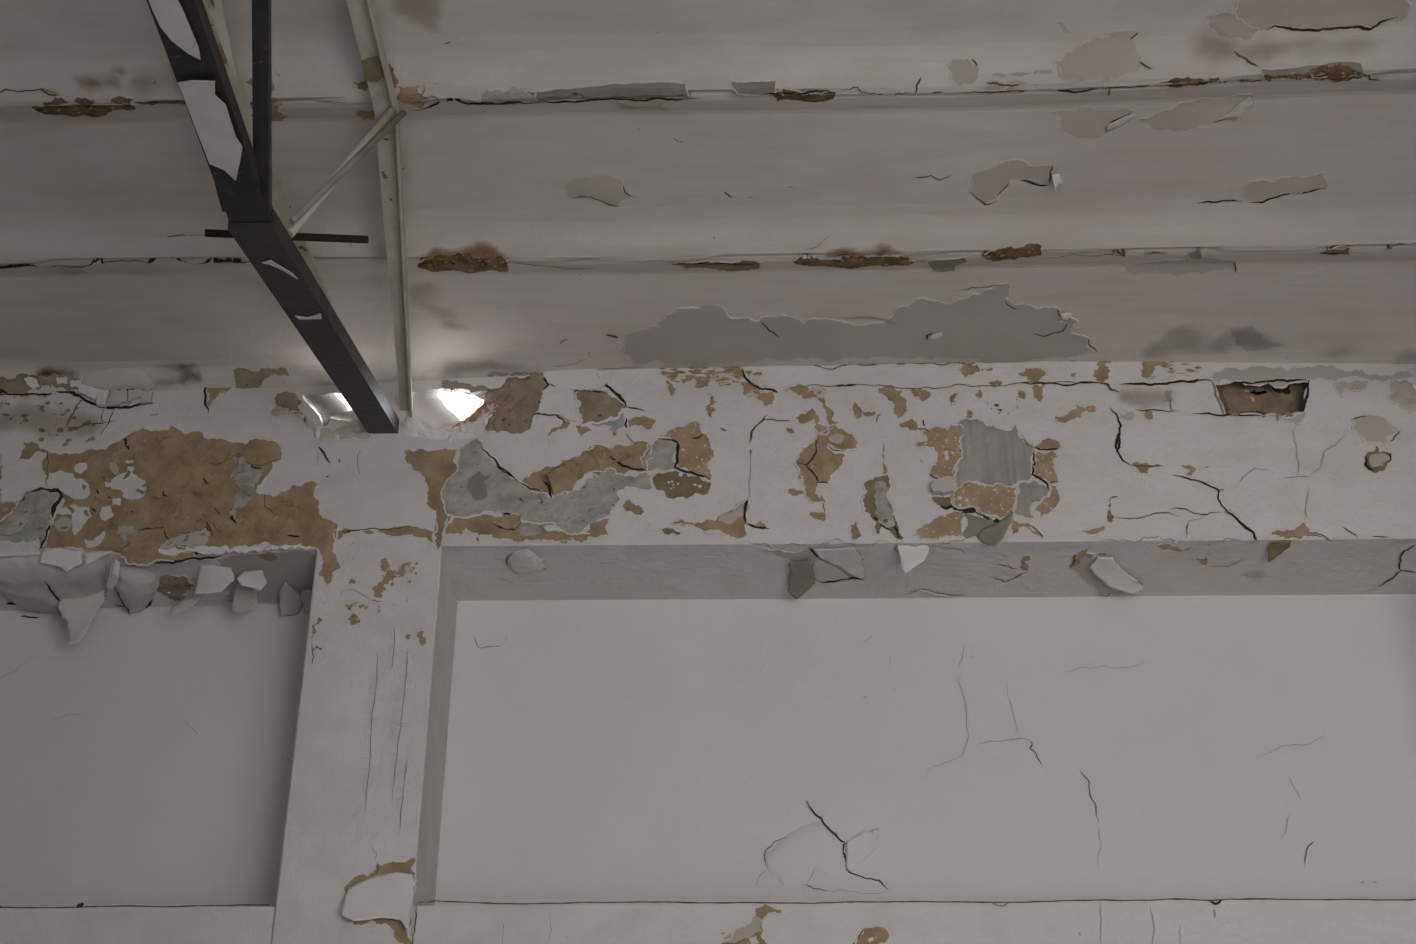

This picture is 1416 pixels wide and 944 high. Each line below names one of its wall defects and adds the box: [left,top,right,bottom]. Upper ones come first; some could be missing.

spalling [729,78,941,103]
peeling [1051,0,1412,140]
crack [0,234,250,275]
peeling [791,235,1238,277]
peeling [1141,362,1416,447]
peeling [0,282,1111,663]
crack [721,362,1416,587]
crack [734,537,1033,598]
crack [925,644,1042,776]
crack [1081,772,1102,863]
peeling [341,857,417,944]
crack [412,881,1416,944]